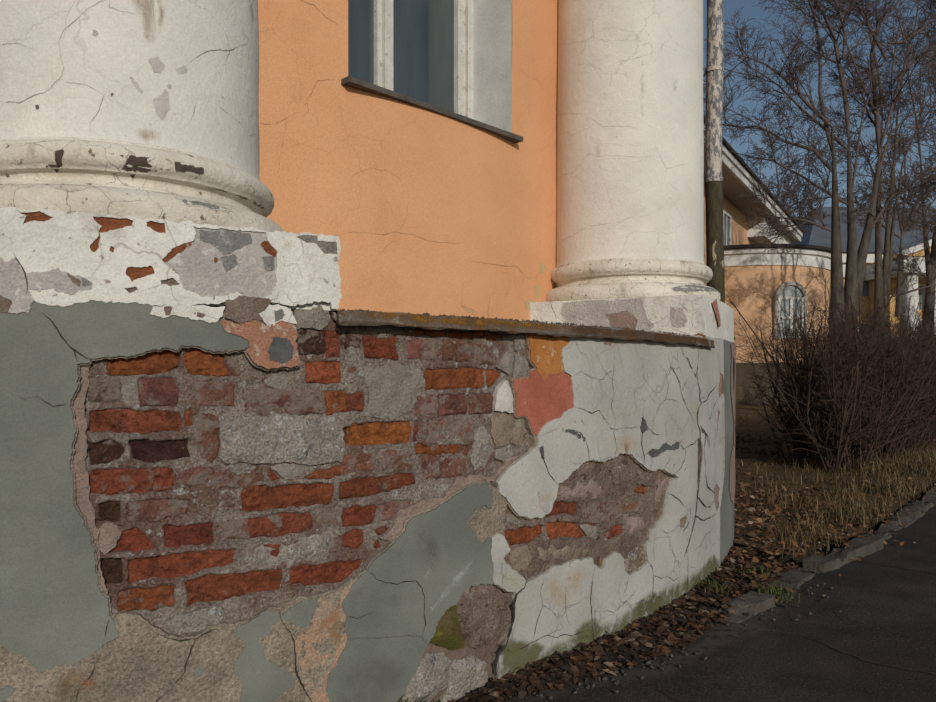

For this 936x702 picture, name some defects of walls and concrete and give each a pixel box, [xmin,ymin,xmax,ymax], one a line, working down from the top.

crack [8,0,122,123]
peeling [46,149,64,177]
peeling [119,155,204,179]
crack [205,187,264,209]
peeling [19,211,53,224]
peeling [90,217,133,252]
peeling [146,221,165,233]
peeling [560,298,655,331]
peeling [670,283,721,327]
flaking render [0,227,573,702]
flaking render [504,443,672,579]
crack [495,349,726,682]